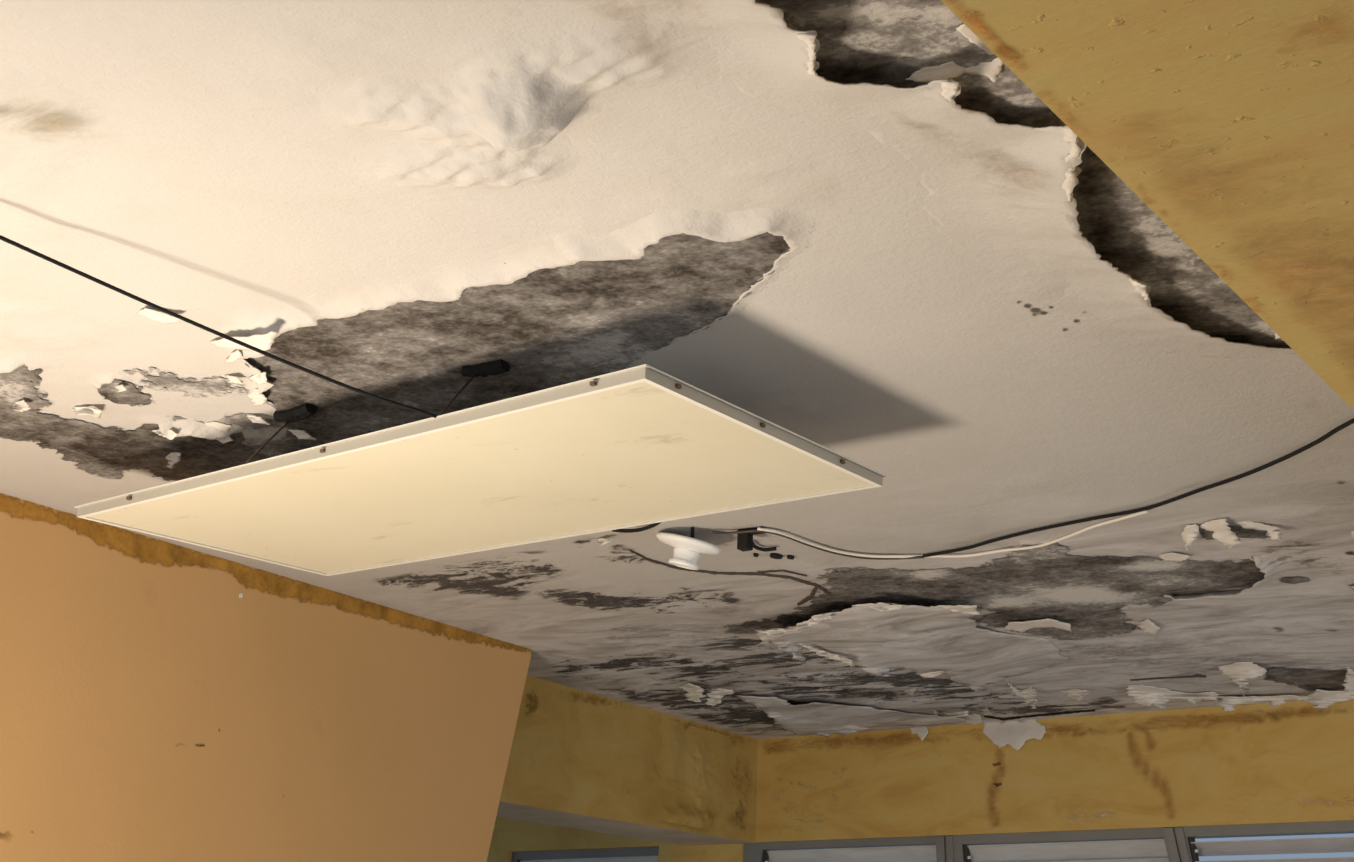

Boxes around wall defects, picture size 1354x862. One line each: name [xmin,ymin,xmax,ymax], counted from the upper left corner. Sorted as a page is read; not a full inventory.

peeling [626,0,1308,365]
peeling [680,518,1310,750]
peeling [1125,661,1354,712]